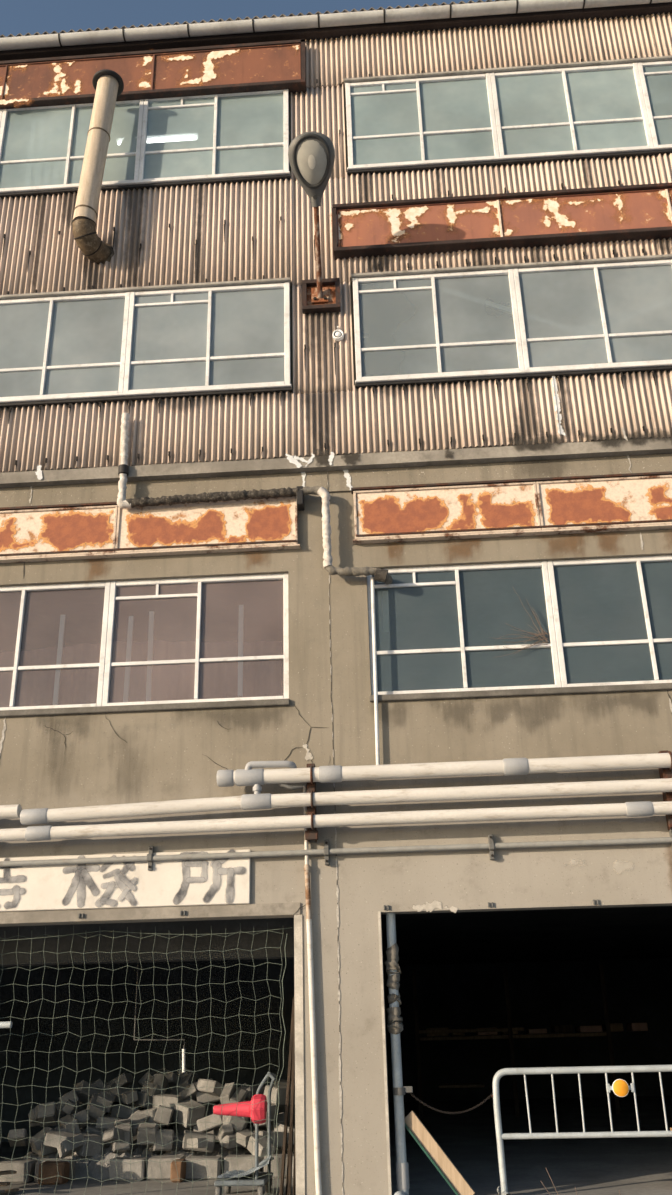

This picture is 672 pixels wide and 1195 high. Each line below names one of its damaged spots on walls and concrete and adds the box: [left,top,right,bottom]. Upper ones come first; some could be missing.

rust [0,502,292,552]
rust [359,484,632,534]
rust [645,484,672,520]
crack [284,575,344,1195]